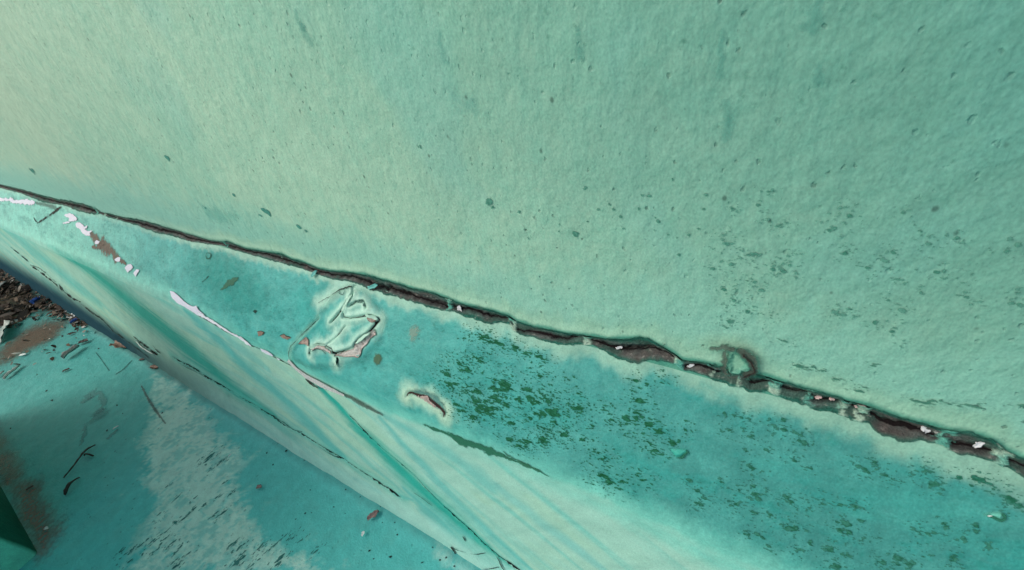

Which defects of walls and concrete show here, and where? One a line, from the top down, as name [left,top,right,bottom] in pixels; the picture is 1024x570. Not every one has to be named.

peeling [63,213,100,244]
crack [13,249,519,570]
peeling [170,283,386,416]
crack [0,184,1024,478]
leakage [503,451,549,477]